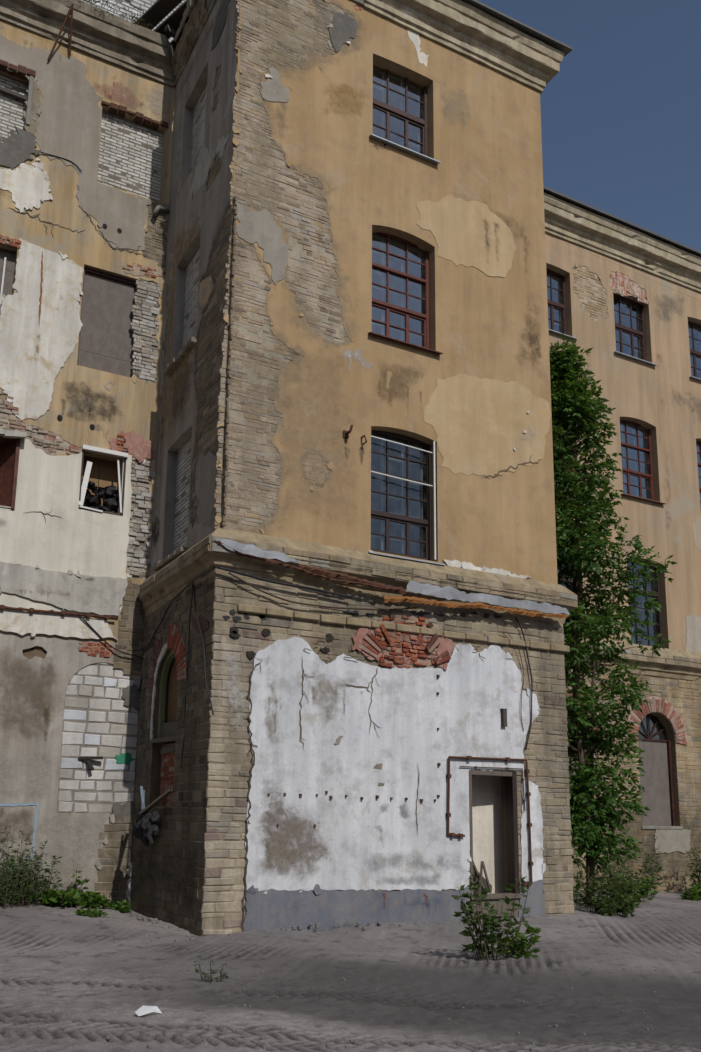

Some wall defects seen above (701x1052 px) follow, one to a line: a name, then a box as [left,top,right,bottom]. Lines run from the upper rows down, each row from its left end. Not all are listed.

flaking render [0,150,53,213]
spalling [189,0,369,534]
leakage [68,385,116,418]
flaking render [0,238,156,676]
crack [300,659,316,749]
crack [346,664,380,735]
flaking render [245,614,546,894]